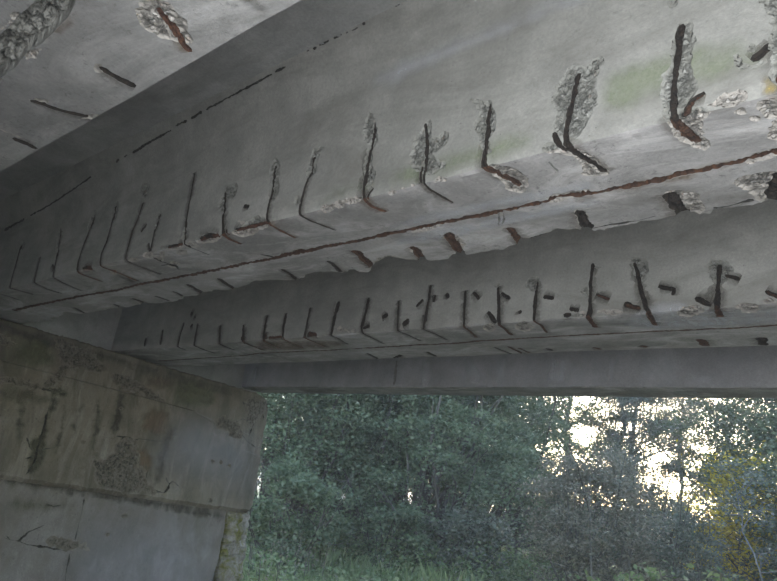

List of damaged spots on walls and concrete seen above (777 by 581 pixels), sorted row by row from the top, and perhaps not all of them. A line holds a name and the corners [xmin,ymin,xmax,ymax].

spalling [135,0,193,53]
spalling [733,0,777,85]
spalling [659,20,777,151]
spalling [542,56,610,176]
crack [4,176,91,231]
spalling [351,250,396,268]
spalling [441,232,466,253]
spalling [503,227,521,245]
spalling [574,209,594,229]
crack [713,199,754,209]
crack [26,379,55,474]
crack [6,499,85,581]